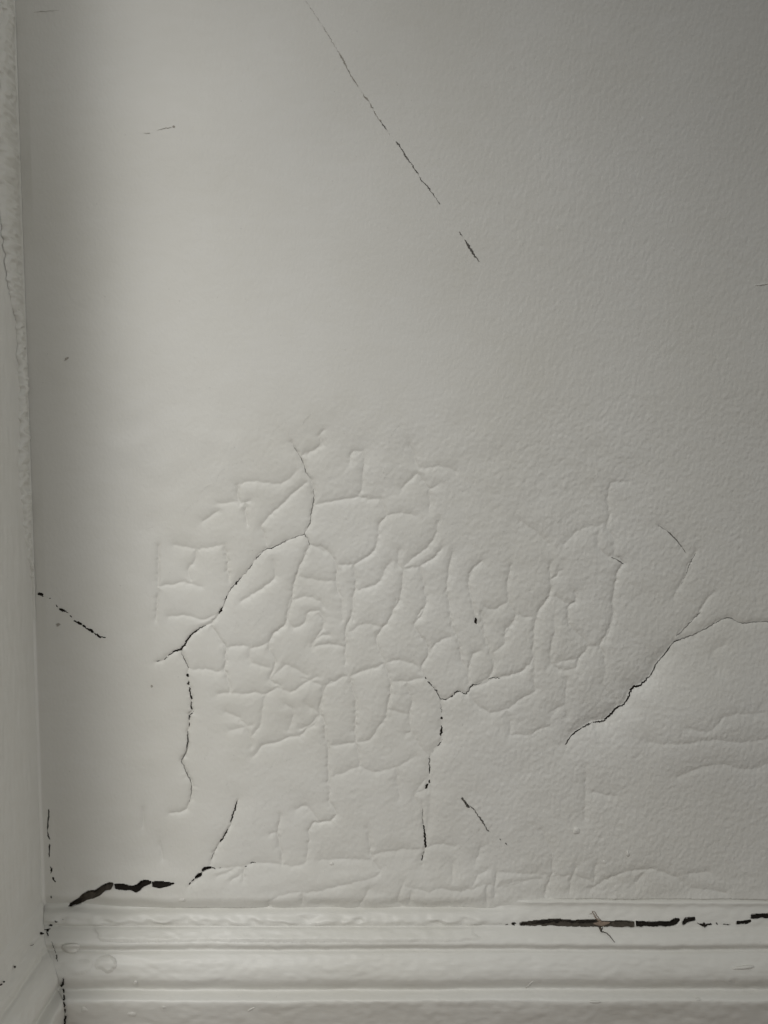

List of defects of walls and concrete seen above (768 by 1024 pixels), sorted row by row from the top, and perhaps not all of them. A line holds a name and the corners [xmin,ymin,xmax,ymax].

crack [307,3,440,204]
crack [38,592,106,638]
crack [157,446,314,802]
crack [421,677,499,860]
crack [565,614,767,745]
crack [31,802,237,1024]
crack [505,913,768,928]